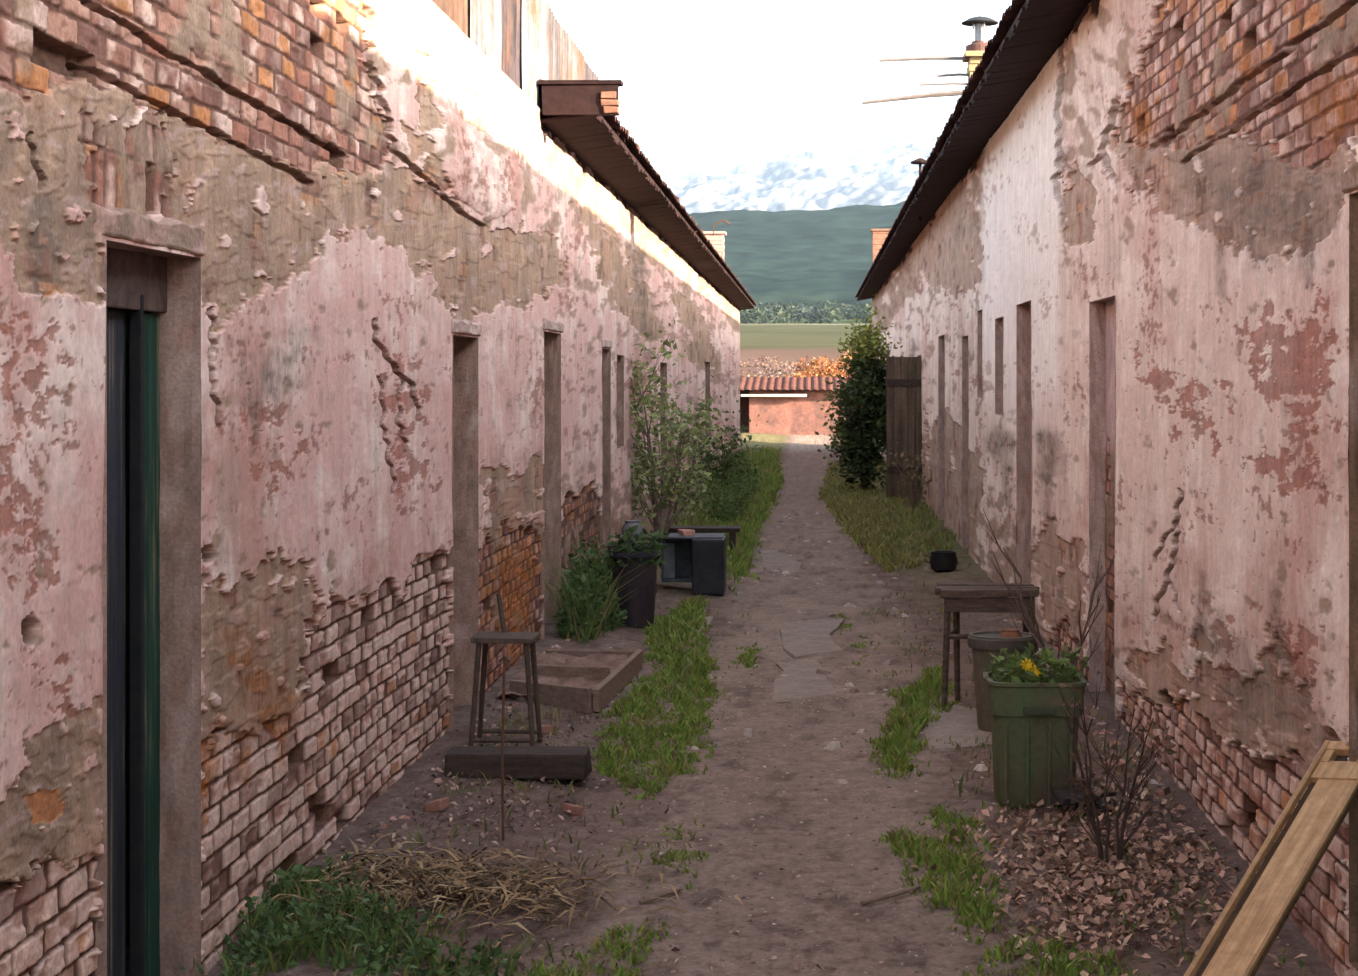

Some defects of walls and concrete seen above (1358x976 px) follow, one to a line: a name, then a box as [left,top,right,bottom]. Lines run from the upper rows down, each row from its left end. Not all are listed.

spalling [0,0,569,332]
flaking render [1108,0,1358,263]
peeling [0,310,71,623]
crack [371,317,421,495]
flaking render [472,454,602,699]
crack [1153,487,1185,622]
peeling [1134,339,1231,458]
peeling [1234,295,1342,508]
spalling [0,652,103,976]
flaking render [189,546,453,976]
flaking render [1117,614,1349,873]
flaking render [1289,822,1357,976]